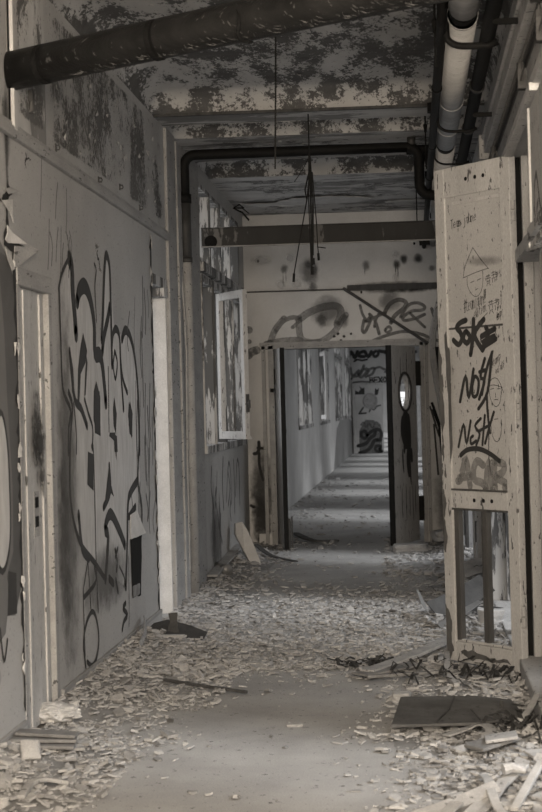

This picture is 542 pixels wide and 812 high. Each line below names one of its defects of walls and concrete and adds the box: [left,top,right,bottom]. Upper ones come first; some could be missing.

peeling [16,0,437,218]
peeling [480,3,511,103]